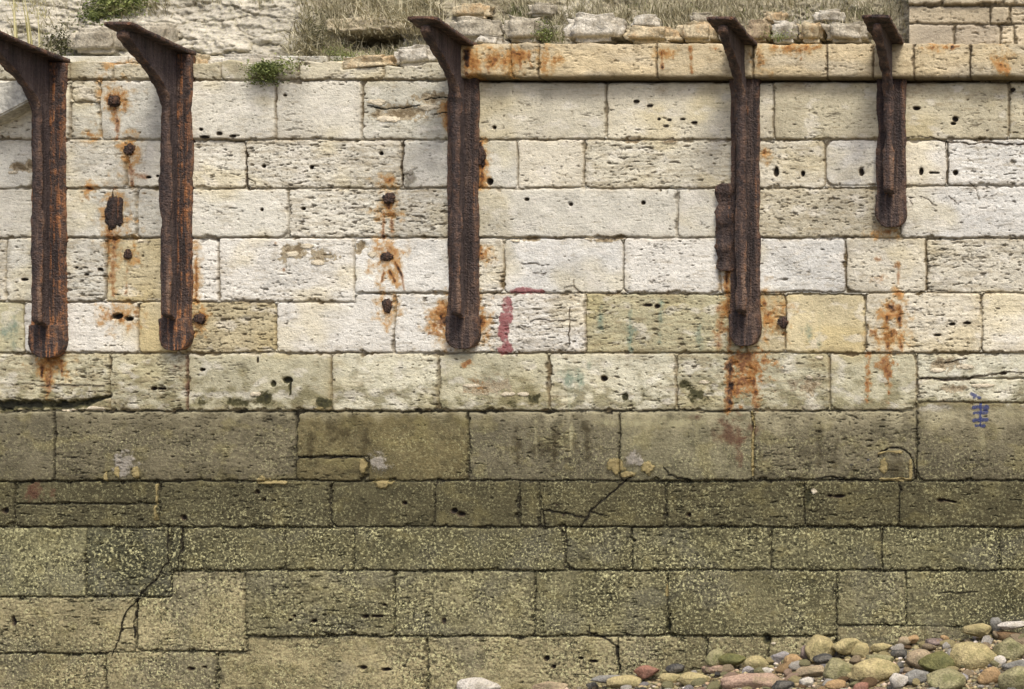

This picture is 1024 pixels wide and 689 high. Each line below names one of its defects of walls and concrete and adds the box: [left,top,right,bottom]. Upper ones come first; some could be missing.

rust [84,62,145,330]
rust [35,357,68,394]
rust [367,200,405,332]
rust [425,294,450,352]
rust [480,298,493,340]
rust [717,271,786,411]
rust [865,262,906,404]
crack [542,476,633,528]
crack [111,526,184,656]